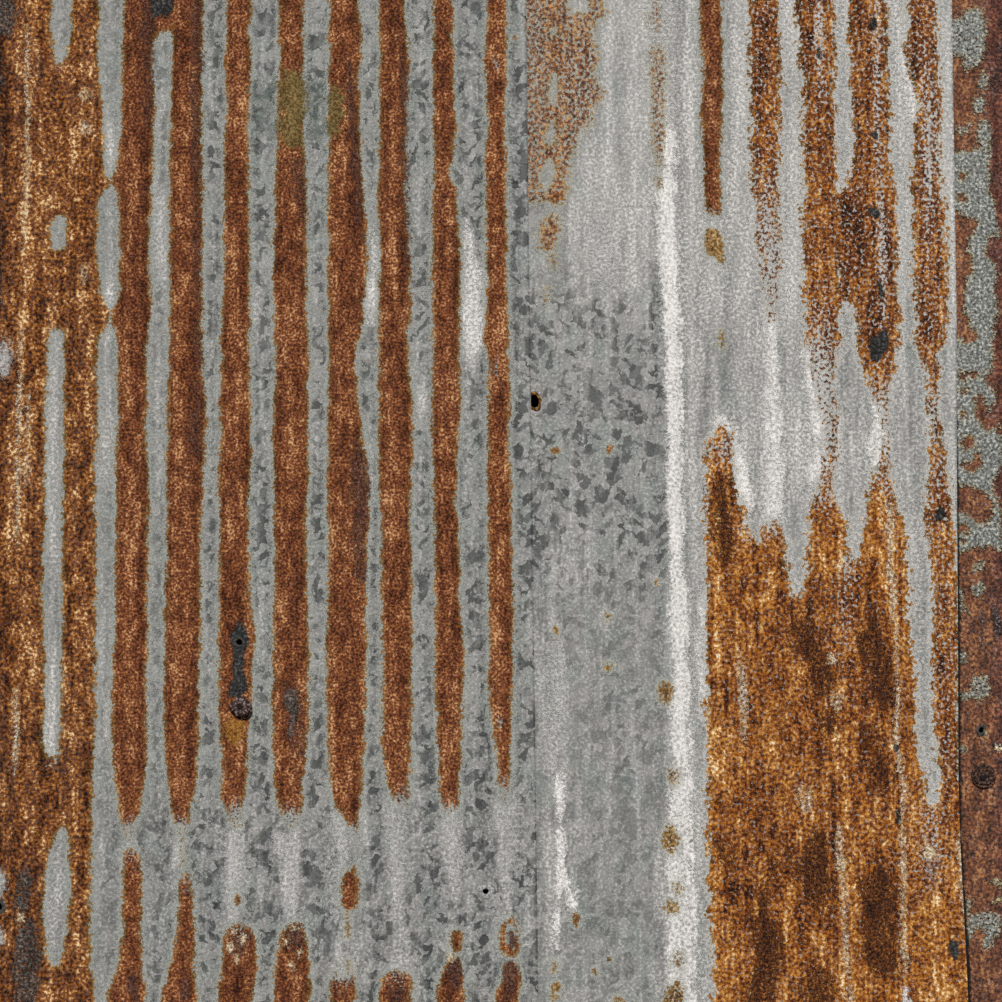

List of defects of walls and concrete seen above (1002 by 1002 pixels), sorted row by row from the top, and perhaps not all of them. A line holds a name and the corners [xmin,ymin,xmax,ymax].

peeling [952,5,1002,615]
corrosion [479,0,610,808]
corrosion [0,0,471,1002]
corrosion [693,0,968,1002]
corrosion [655,676,675,707]
peeling [960,673,992,701]
corrosion [665,766,682,788]
corrosion [658,820,683,858]
corrosion [660,878,689,916]
corrosion [491,913,526,1002]
corrosion [547,957,565,1002]
corrosion [661,950,686,1002]